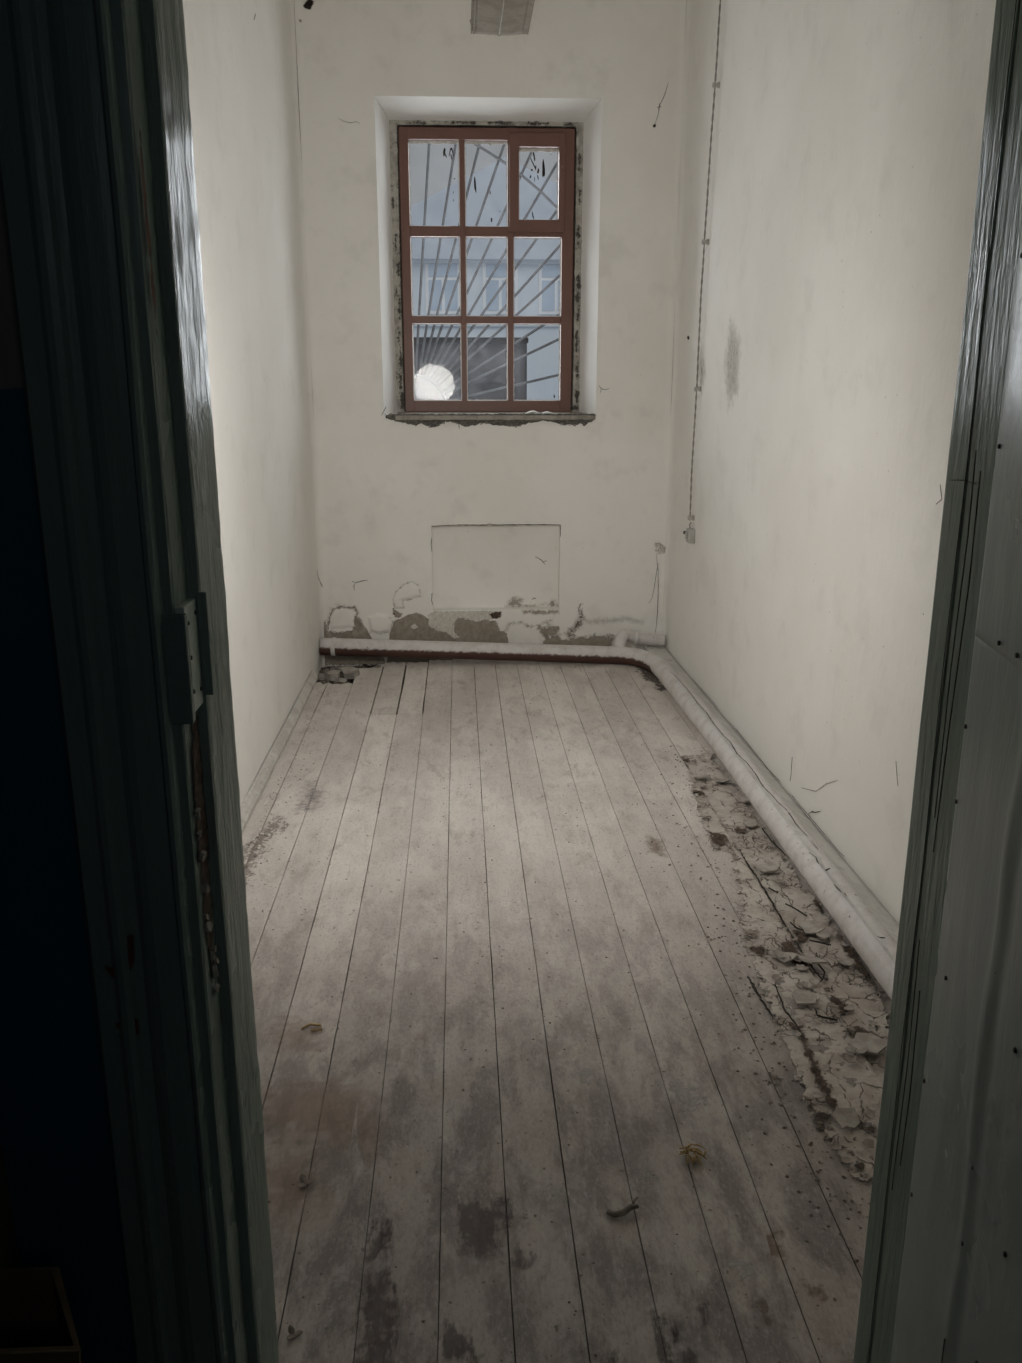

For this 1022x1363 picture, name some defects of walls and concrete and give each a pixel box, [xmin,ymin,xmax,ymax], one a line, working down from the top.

flaking render [324,616,372,639]
flaking render [389,597,508,643]
flaking render [318,655,453,684]
peeling [743,924,820,988]